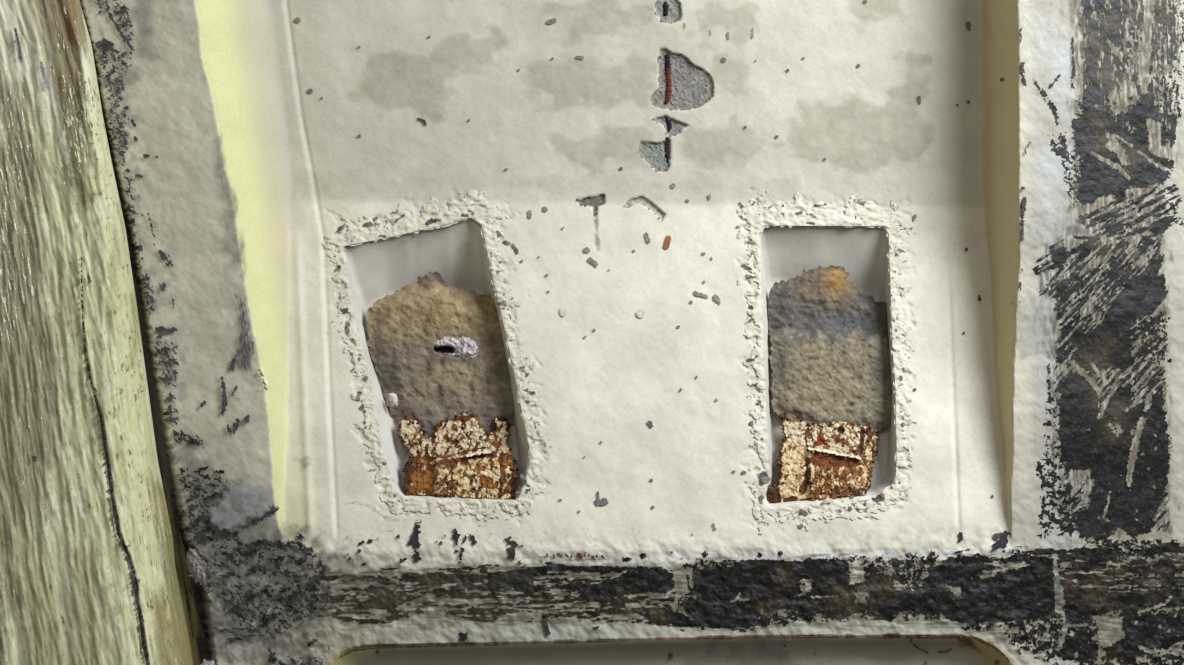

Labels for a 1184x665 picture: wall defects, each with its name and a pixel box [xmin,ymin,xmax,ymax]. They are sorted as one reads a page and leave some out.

crack [80,258,153,665]
damp [95,0,362,665]
peeling [291,0,1184,665]